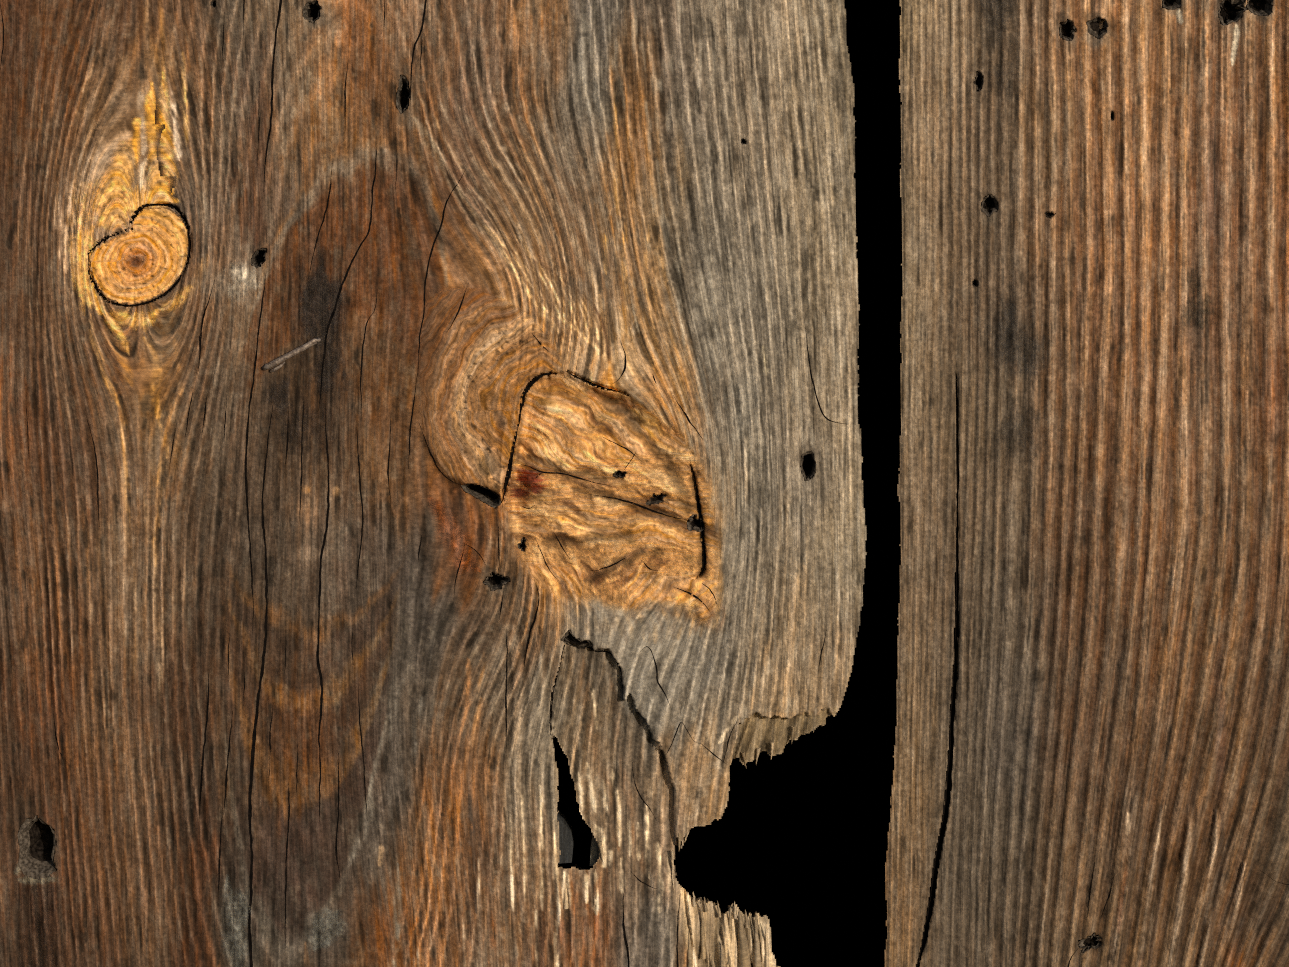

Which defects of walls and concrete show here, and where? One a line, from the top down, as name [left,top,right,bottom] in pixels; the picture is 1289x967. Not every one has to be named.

crack [87,203,215,364]
crack [342,67,350,125]
crack [170,136,469,967]
crack [454,335,716,756]
crack [550,638,736,763]
crack [917,367,959,967]